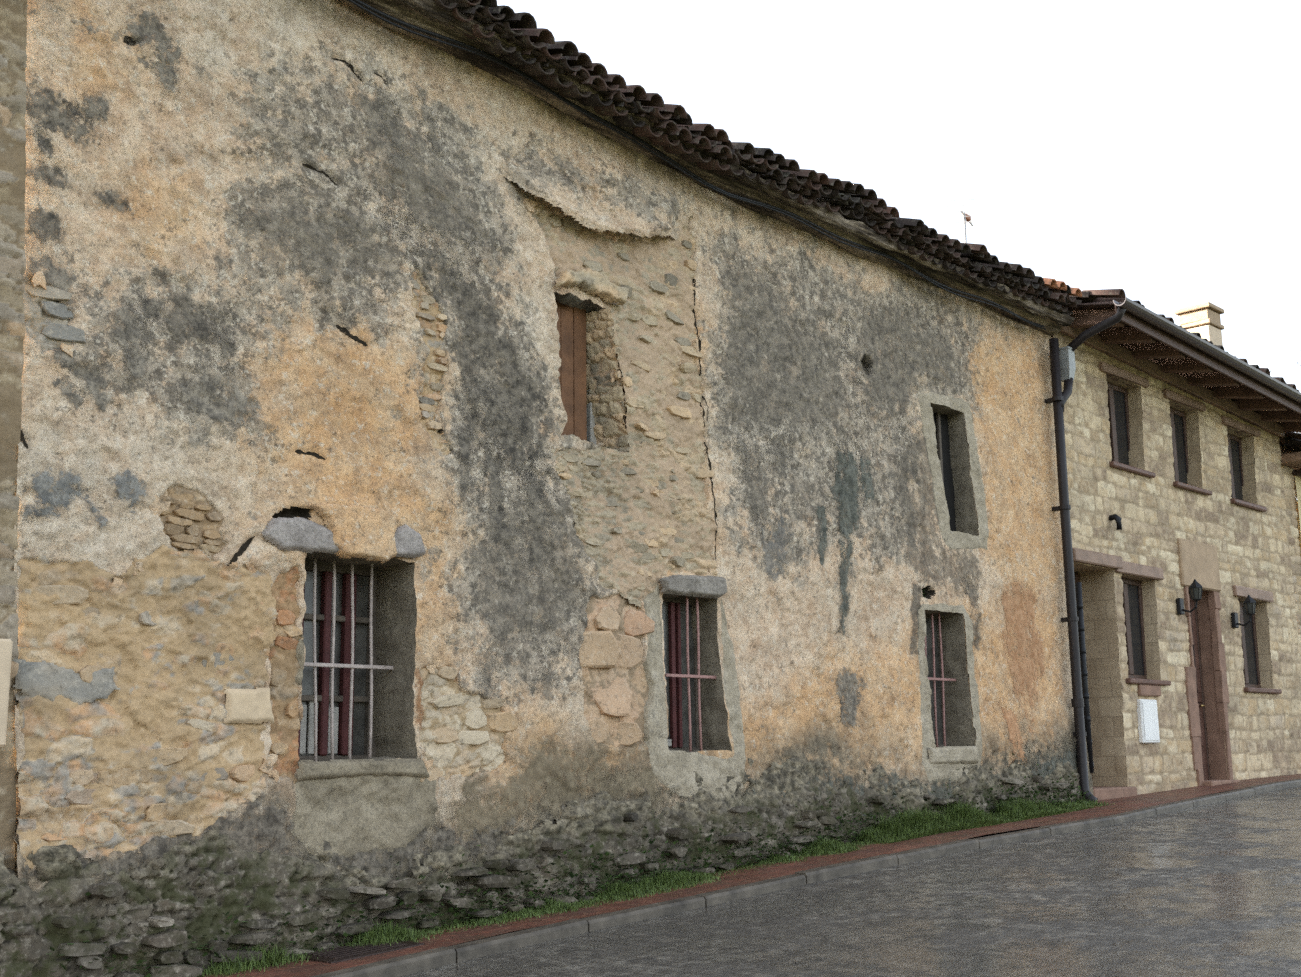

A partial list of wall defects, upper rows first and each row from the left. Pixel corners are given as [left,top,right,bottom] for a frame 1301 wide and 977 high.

water stain [25,74,109,190]
crack [303,164,337,185]
flaking render [23,271,86,357]
water stain [112,282,263,426]
crack [336,325,368,346]
flaking render [411,268,451,455]
flaking render [524,198,717,747]
crack [692,279,717,561]
water stain [816,506,853,636]
flaking render [12,485,303,872]
flaking render [420,665,519,782]
water stain [78,789,303,884]